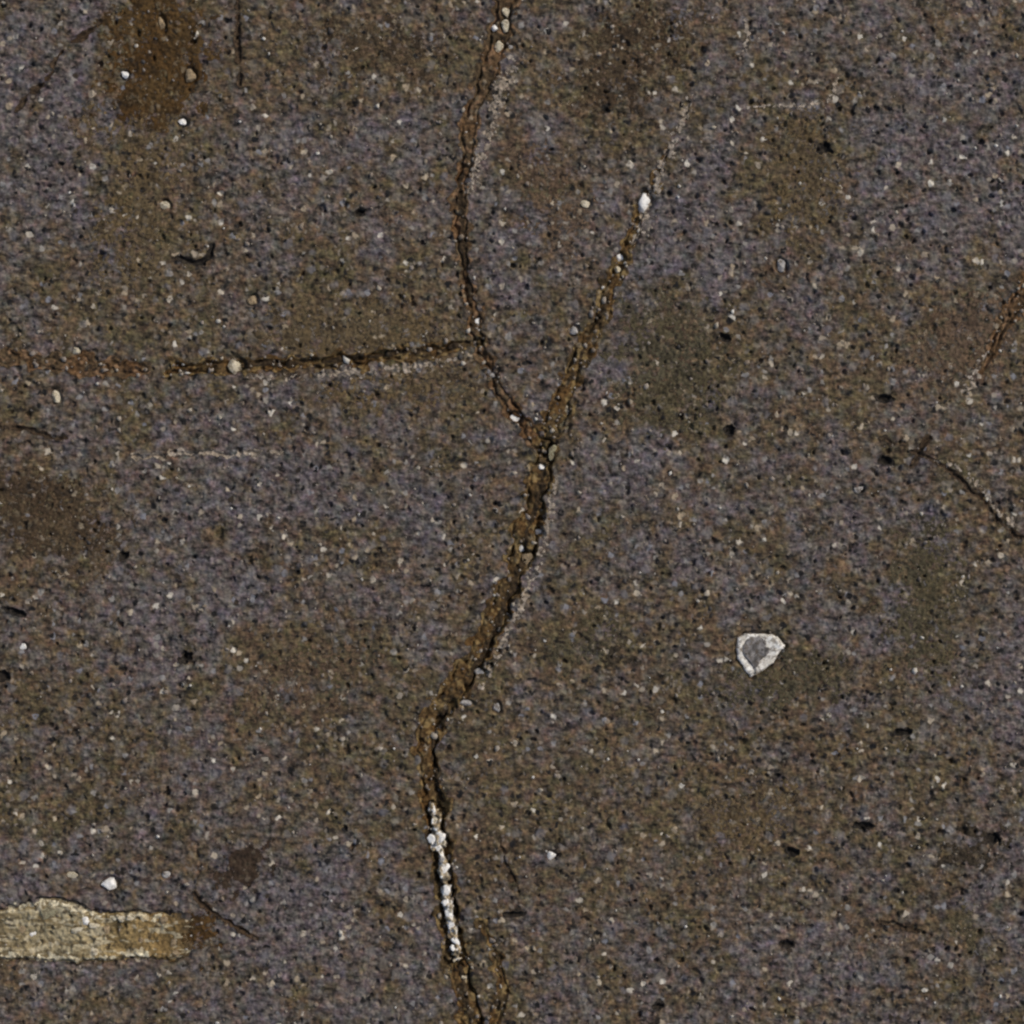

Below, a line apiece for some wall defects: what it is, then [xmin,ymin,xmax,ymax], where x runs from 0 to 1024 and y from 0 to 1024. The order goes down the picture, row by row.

spalling [0,898,223,964]
crack [0,0,695,1024]